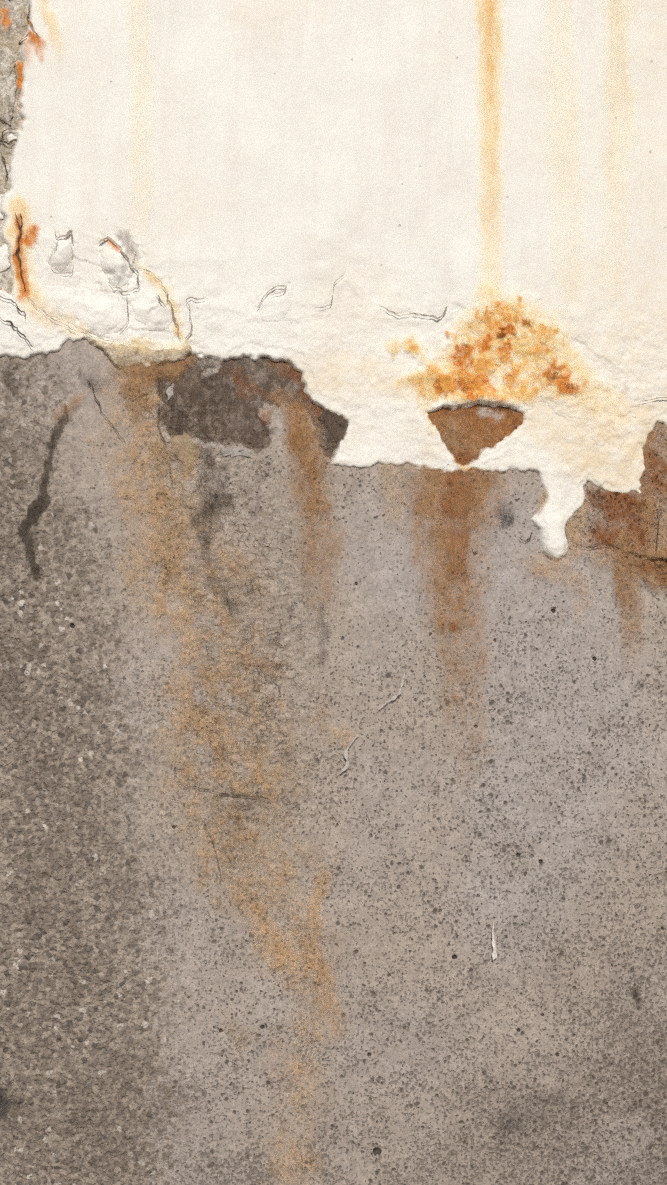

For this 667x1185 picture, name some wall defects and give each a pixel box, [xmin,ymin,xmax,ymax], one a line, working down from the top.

spalling [0,0,29,294]
corrosion [10,205,38,298]
corrosion [118,356,258,718]
spalling [81,337,348,495]
corrosion [278,401,330,512]
corrosion [392,339,420,353]
corrosion [414,418,496,632]
peeling [428,404,524,449]
corrosion [409,296,588,402]
spalling [591,422,667,558]